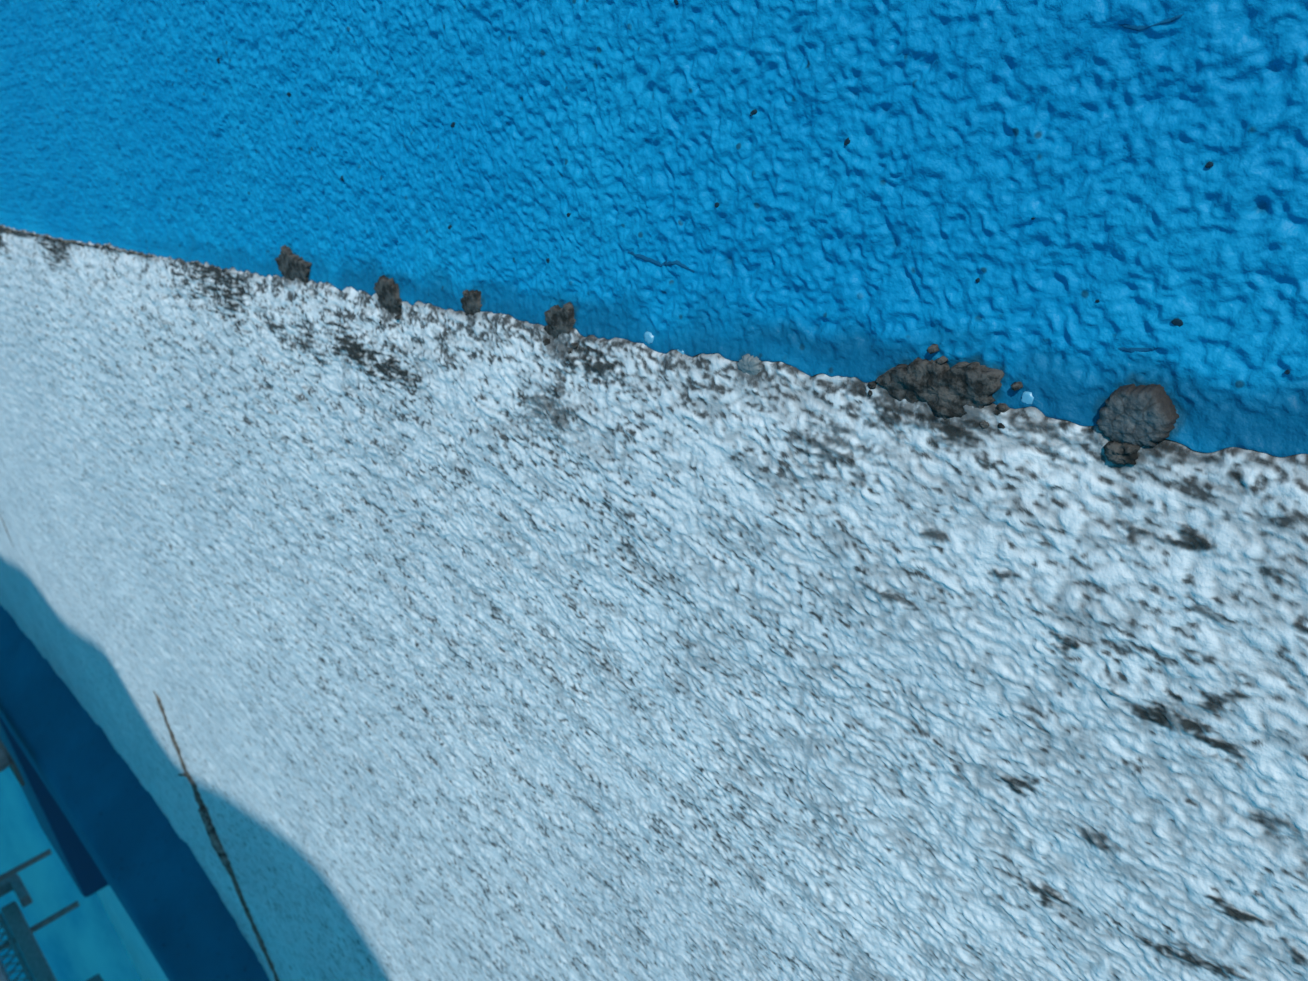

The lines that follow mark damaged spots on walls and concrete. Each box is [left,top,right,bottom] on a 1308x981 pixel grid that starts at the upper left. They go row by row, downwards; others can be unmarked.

leakage [0,226,154,275]
leakage [170,262,252,326]
leakage [263,313,422,403]
leakage [561,347,628,384]
leakage [1117,520,1213,550]
leakage [1050,632,1079,651]
leakage [1133,690,1247,769]
leakage [1001,777,1038,794]
crack [153,691,280,981]
leakage [1019,882,1070,907]
leakage [1207,896,1264,925]
leakage [1141,939,1245,979]